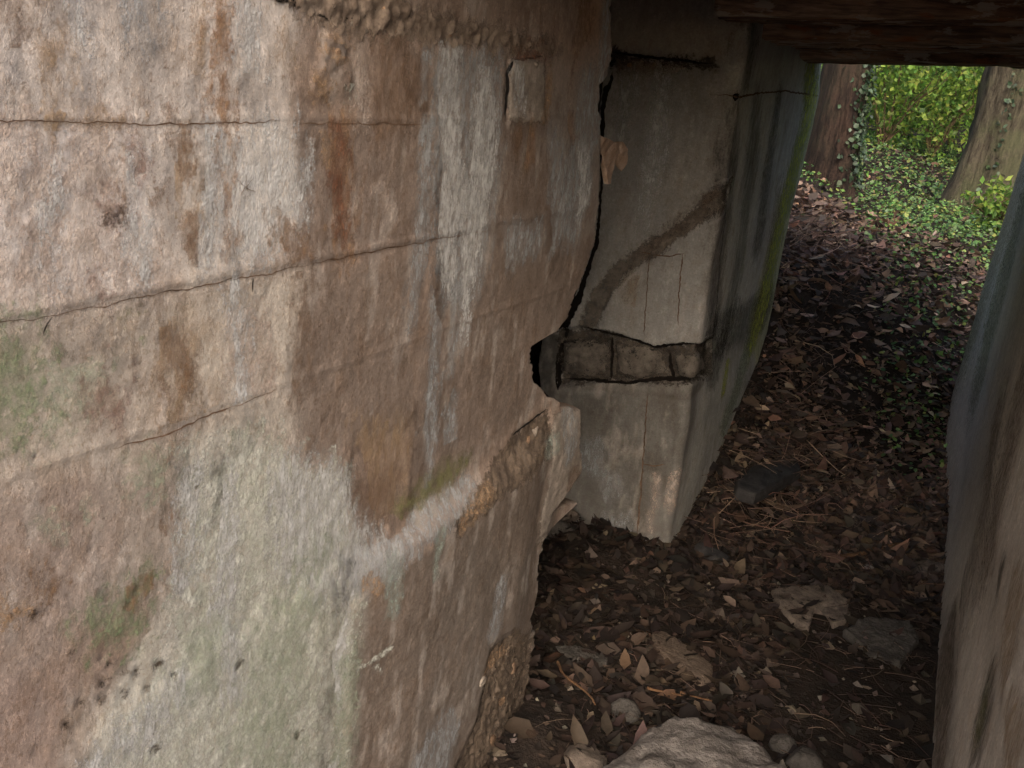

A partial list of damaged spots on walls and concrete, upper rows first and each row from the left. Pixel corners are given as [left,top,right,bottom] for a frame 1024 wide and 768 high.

crack [0,118,420,126]
crack [710,90,818,101]
damp [0,106,162,321]
crack [0,230,490,334]
crack [555,54,616,390]
damp [76,0,682,768]
spalling [454,406,582,551]